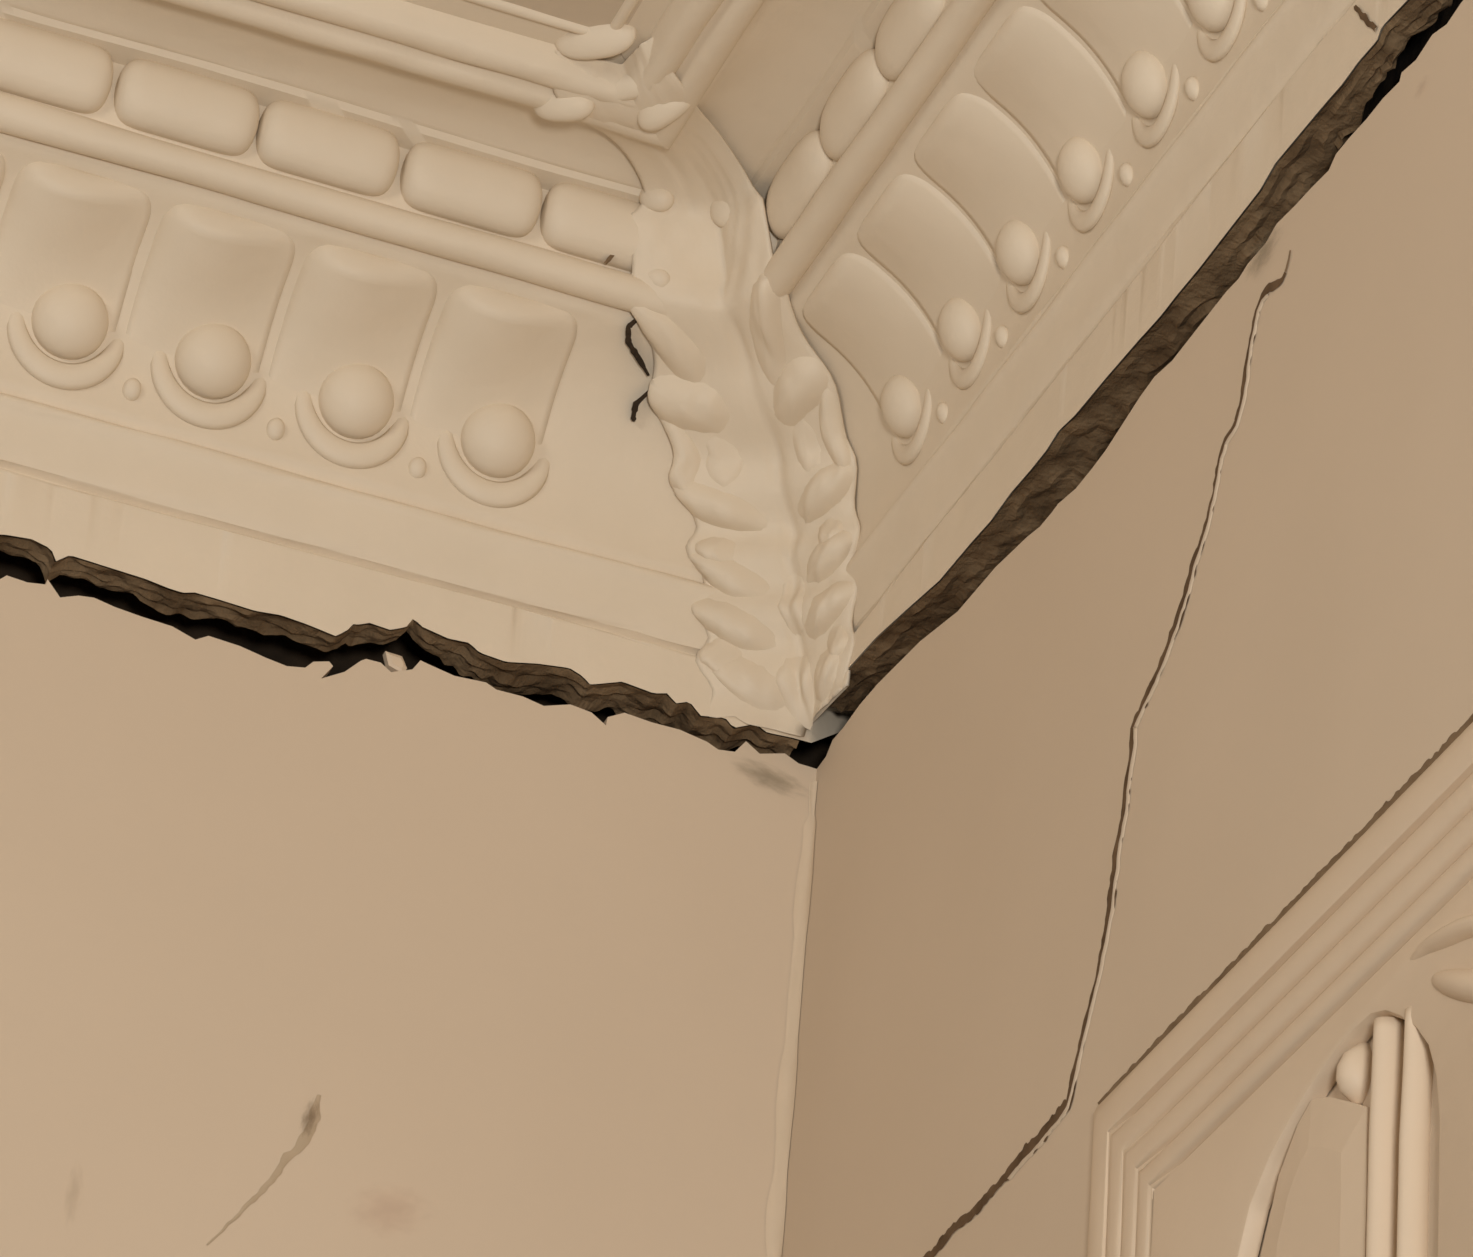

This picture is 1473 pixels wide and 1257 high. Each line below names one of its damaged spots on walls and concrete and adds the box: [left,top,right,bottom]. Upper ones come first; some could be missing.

crack [0,0,1463,769]
crack [923,250,1291,1257]